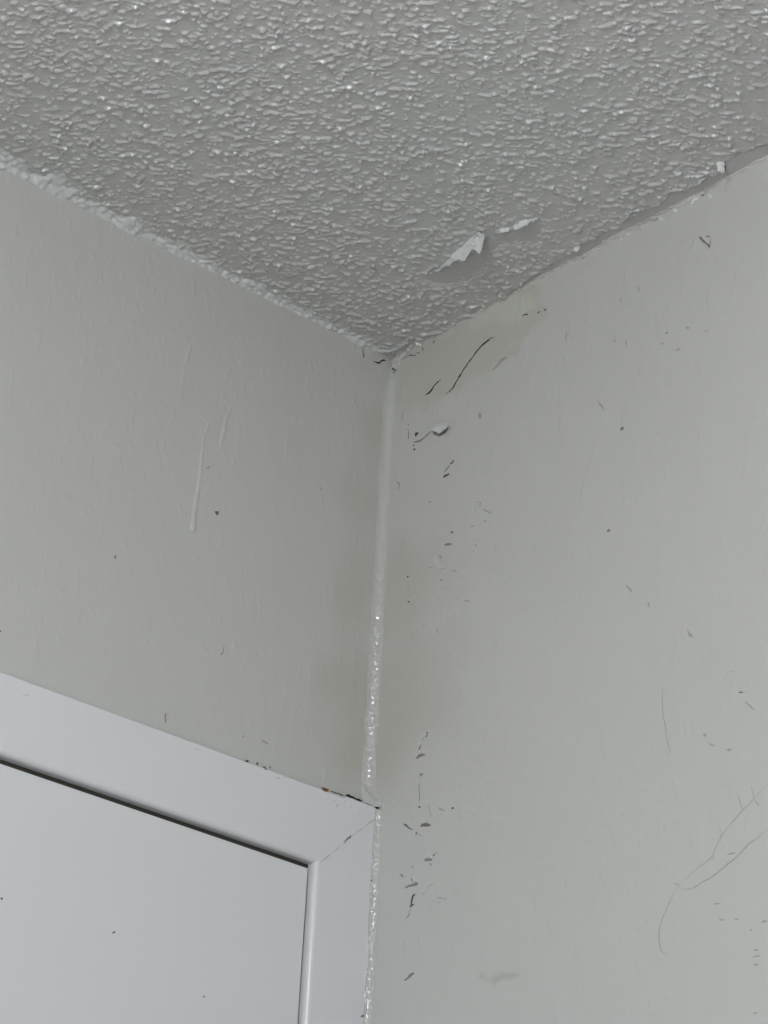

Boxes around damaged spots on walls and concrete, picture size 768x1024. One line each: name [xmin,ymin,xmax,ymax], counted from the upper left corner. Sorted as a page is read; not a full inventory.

peeling [498,218,537,233]
peeling [428,232,485,274]
crack [426,335,494,398]